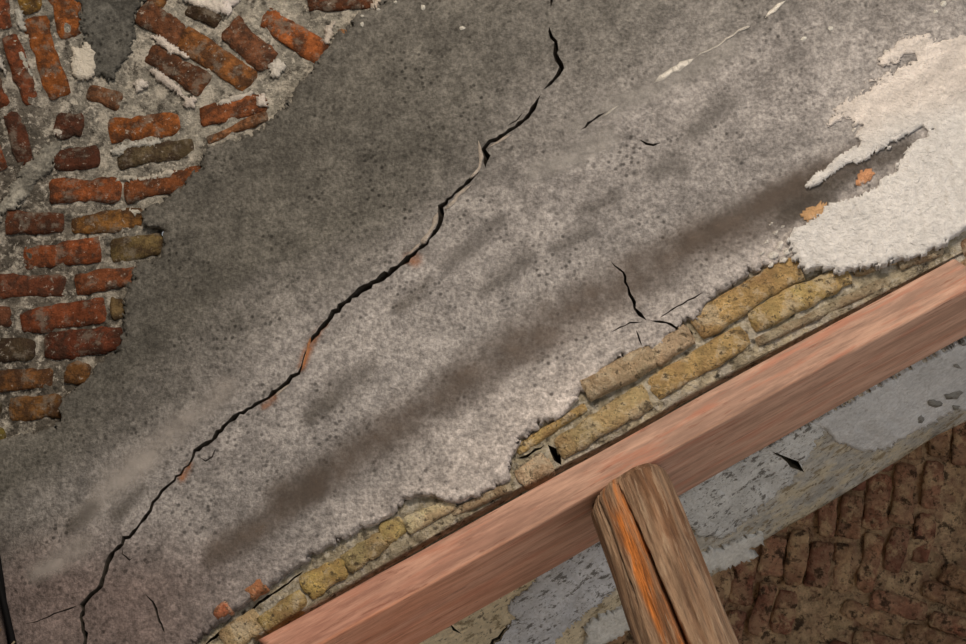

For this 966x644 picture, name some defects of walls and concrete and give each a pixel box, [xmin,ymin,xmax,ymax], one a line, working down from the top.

spalling [0,0,381,440]
crack [26,0,564,644]
spalling [198,33,966,644]
crack [582,112,606,129]
crack [612,263,703,347]